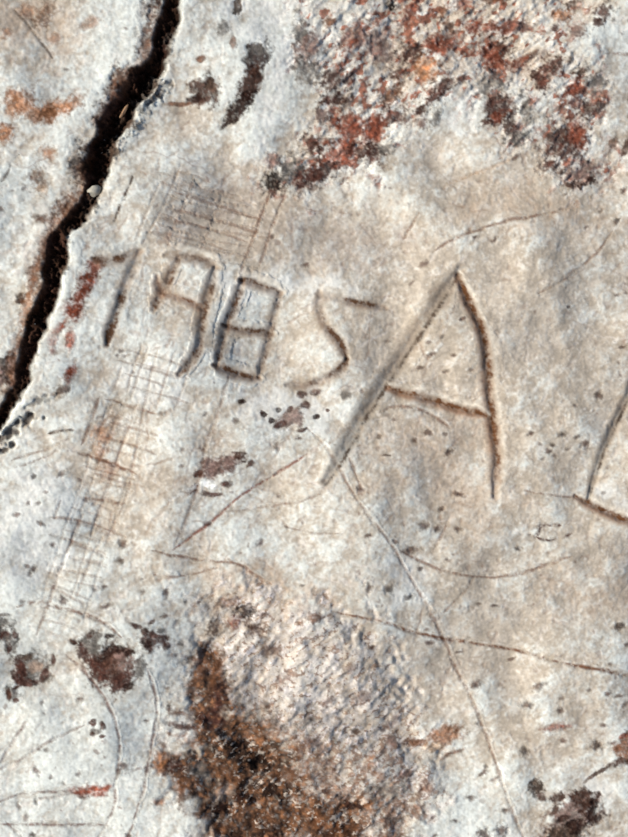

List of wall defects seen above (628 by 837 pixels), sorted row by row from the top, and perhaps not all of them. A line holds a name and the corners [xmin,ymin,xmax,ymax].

crack [0,0,199,456]